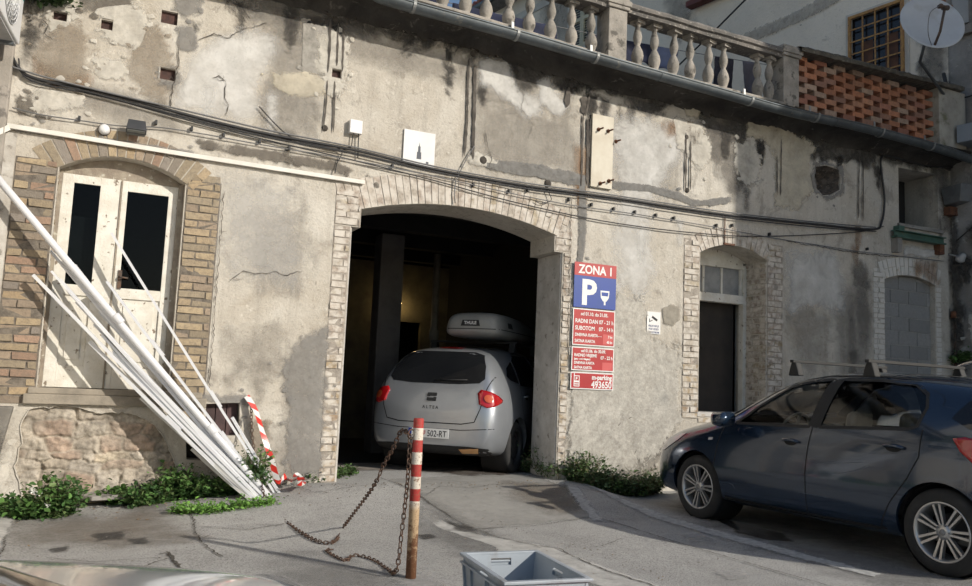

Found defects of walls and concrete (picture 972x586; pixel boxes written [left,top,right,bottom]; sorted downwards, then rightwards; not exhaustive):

leakage [21,0,44,49]
flaking render [14,0,204,134]
leakage [83,89,146,117]
leakage [176,0,680,297]
leakage [698,112,765,209]
flaking render [734,122,844,209]
crack [208,195,302,388]
crack [47,551,181,568]
crack [189,512,289,556]